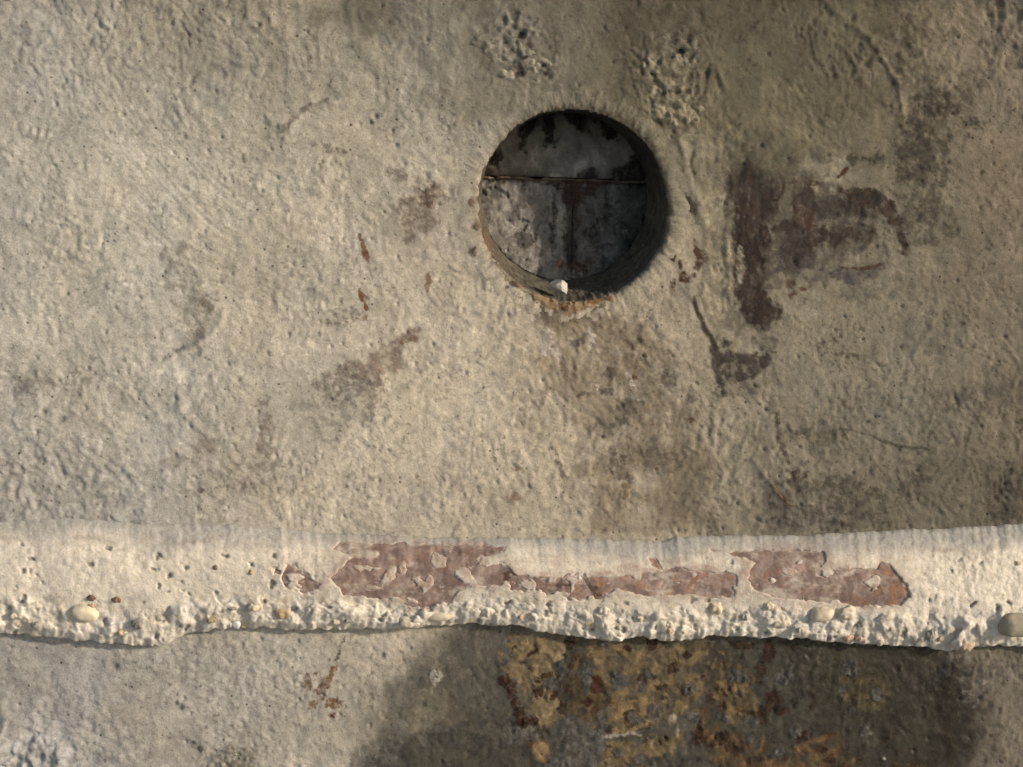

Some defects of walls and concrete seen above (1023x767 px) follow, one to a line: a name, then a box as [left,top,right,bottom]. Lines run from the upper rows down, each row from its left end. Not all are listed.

corrosion [499,180,618,272]
leakage [361,626,977,767]
corrosion [497,625,861,767]